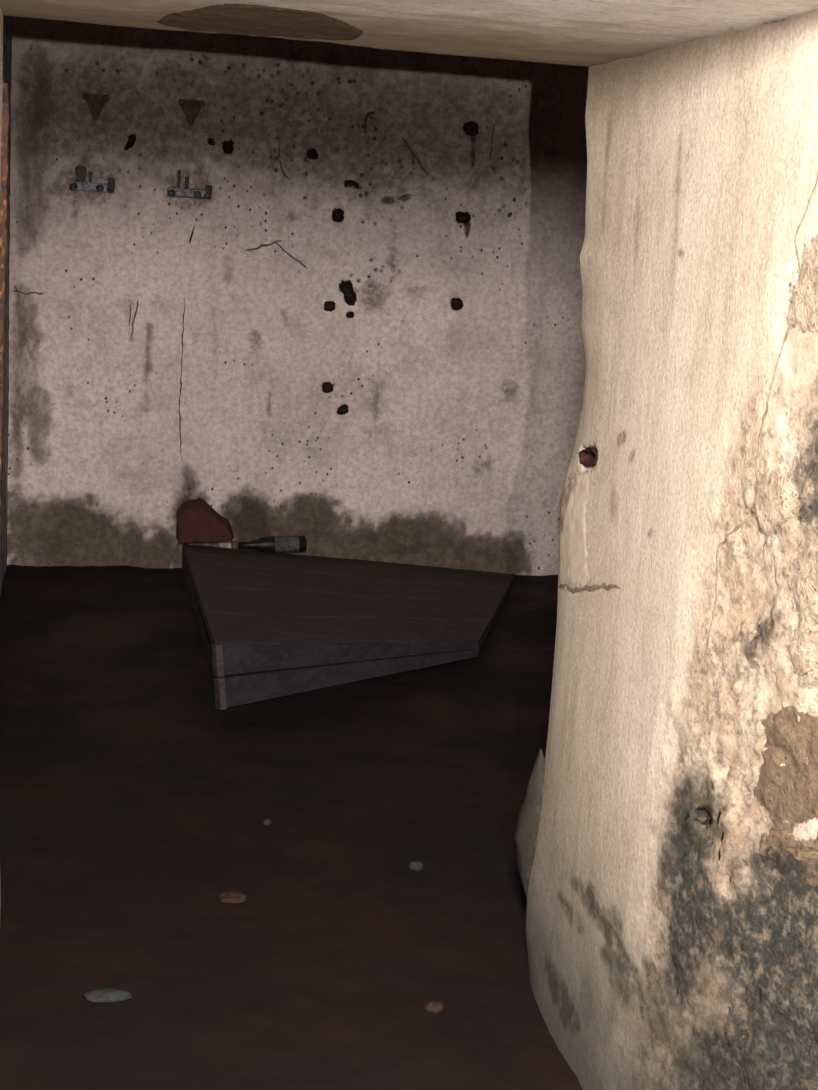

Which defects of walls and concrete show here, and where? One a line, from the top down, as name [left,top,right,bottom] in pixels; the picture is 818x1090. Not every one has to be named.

spalling [786,234,818,333]
water stain [7,471,222,568]
water stain [222,491,527,574]
spalling [752,446,818,541]
spalling [787,549,818,689]
spalling [753,706,818,894]
water stain [575,882,649,998]
water stain [659,778,818,1090]